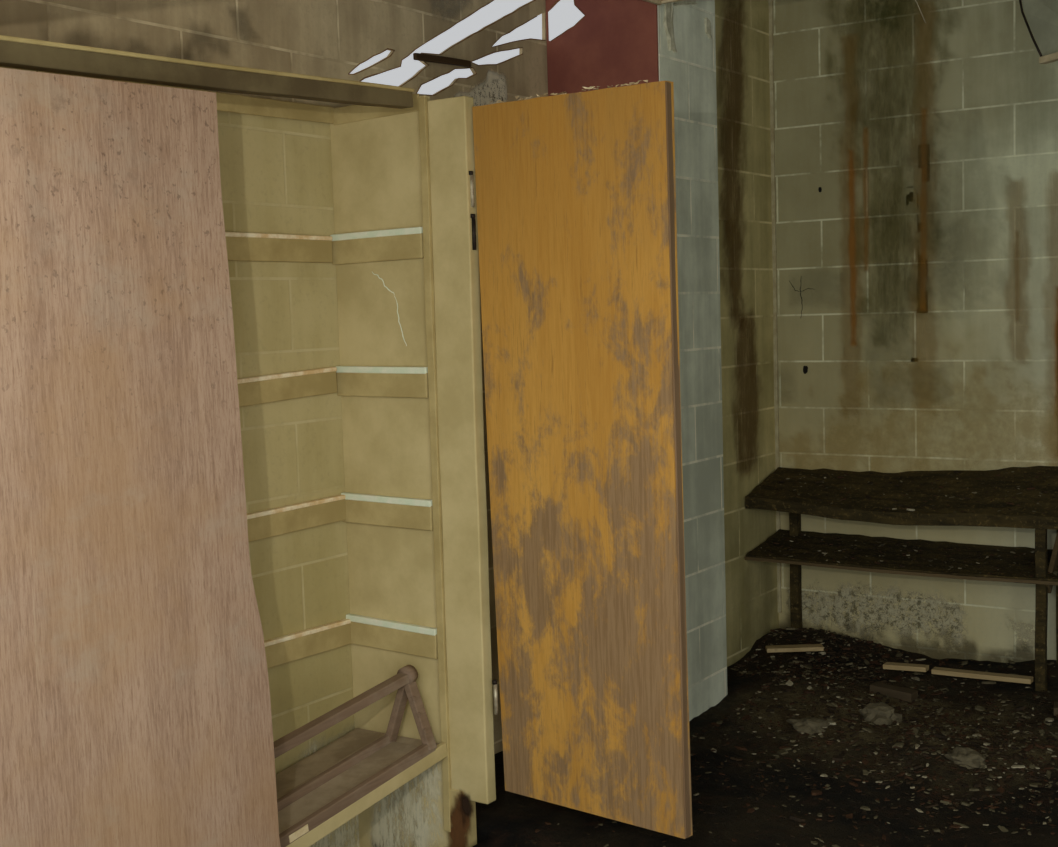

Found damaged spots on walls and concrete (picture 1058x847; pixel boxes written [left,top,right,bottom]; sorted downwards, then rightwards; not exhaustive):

leakage [788,587,976,661]